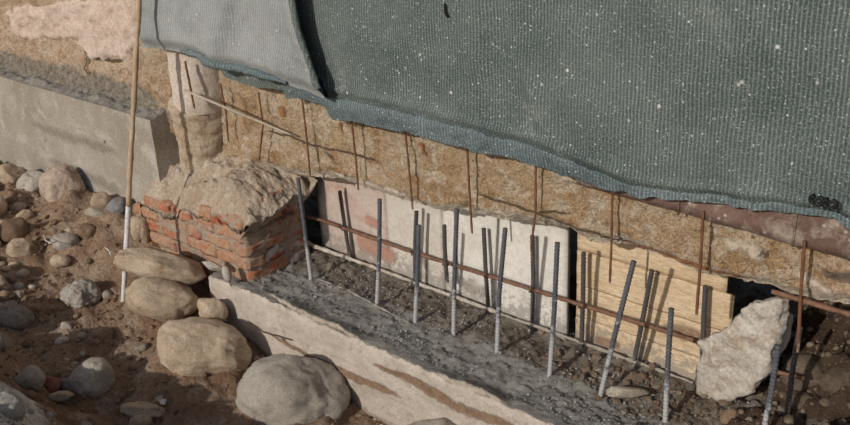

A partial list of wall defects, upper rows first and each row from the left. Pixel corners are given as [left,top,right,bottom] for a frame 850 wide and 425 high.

spalling [725,238,763,261]
spalling [794,270,831,293]
spalling [771,289,850,317]
crack [247,320,293,342]
spalling [762,326,805,425]